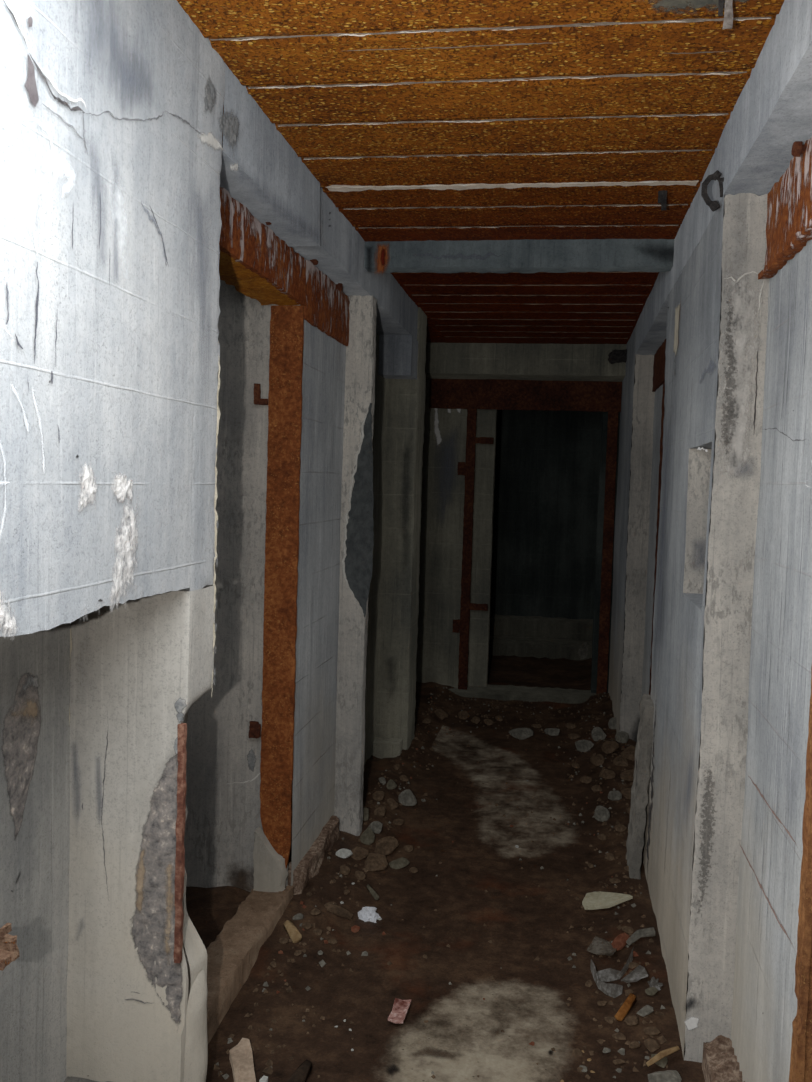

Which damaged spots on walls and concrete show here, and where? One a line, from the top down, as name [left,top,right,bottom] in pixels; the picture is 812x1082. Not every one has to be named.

crack [3,0,220,155]
rust [376,245,388,273]
peeling [0,591,16,636]
peeling [79,466,97,510]
peeling [110,473,138,608]
spalling [342,403,374,617]
spalling [2,673,41,837]
spalling [131,737,183,1023]